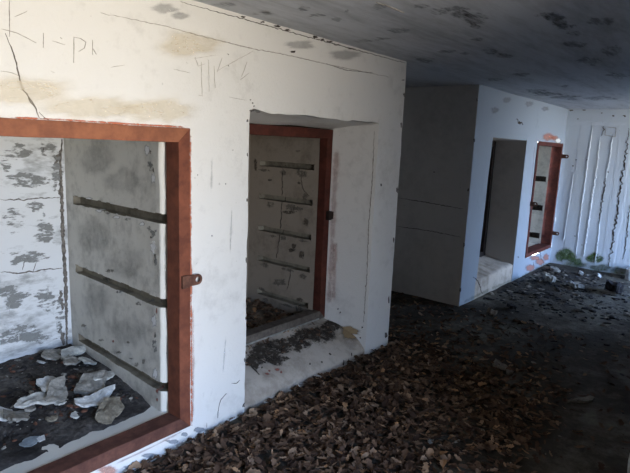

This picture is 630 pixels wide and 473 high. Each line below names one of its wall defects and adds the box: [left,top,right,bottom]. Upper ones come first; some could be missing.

crack [3,33,48,120]
crack [103,13,387,77]
peeling [0,139,68,345]
crack [599,130,630,266]